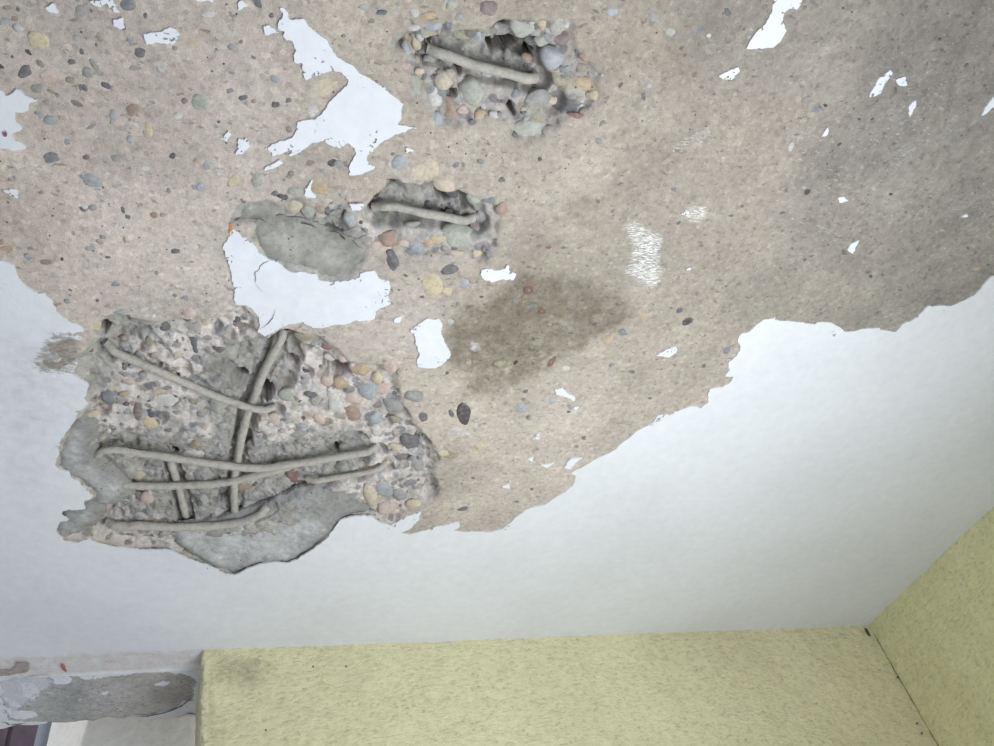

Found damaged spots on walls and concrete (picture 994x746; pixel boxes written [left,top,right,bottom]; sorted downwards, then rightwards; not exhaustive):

peeling [0,0,994,574]
peeling [0,662,140,729]
peeling [123,669,201,720]